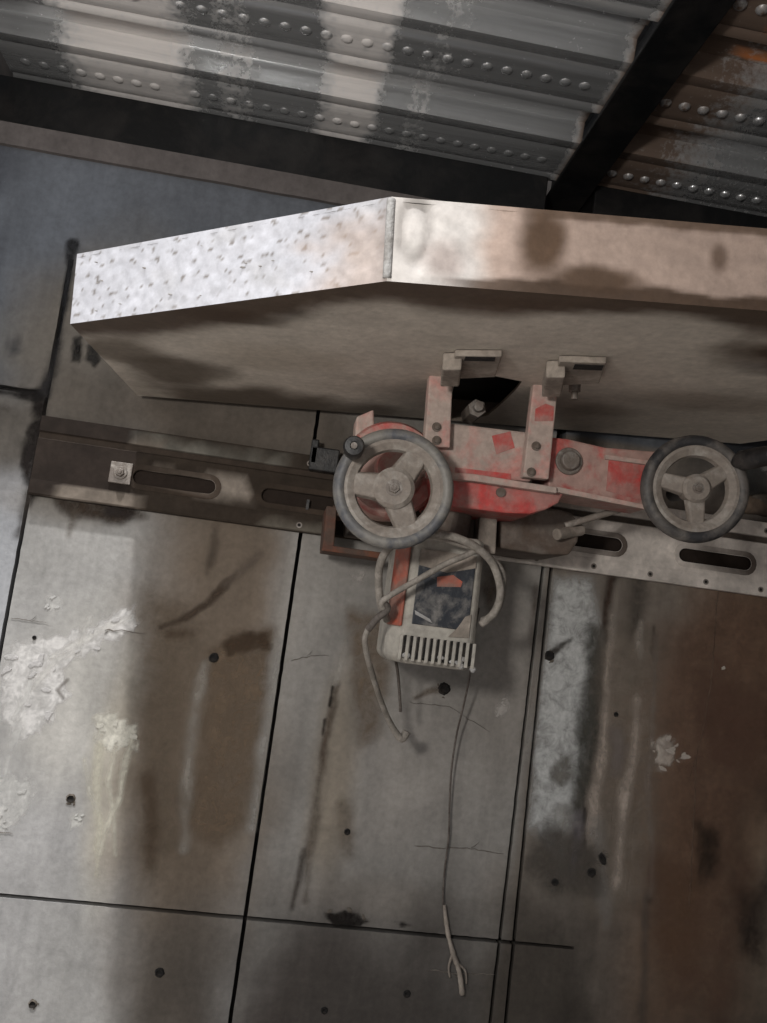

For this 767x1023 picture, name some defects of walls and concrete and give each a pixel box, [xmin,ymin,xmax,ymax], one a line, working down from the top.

water stain [160,559,257,629]
peeling [0,608,138,832]
water stain [529,576,620,873]
water stain [619,718,638,822]
peeling [651,735,691,771]